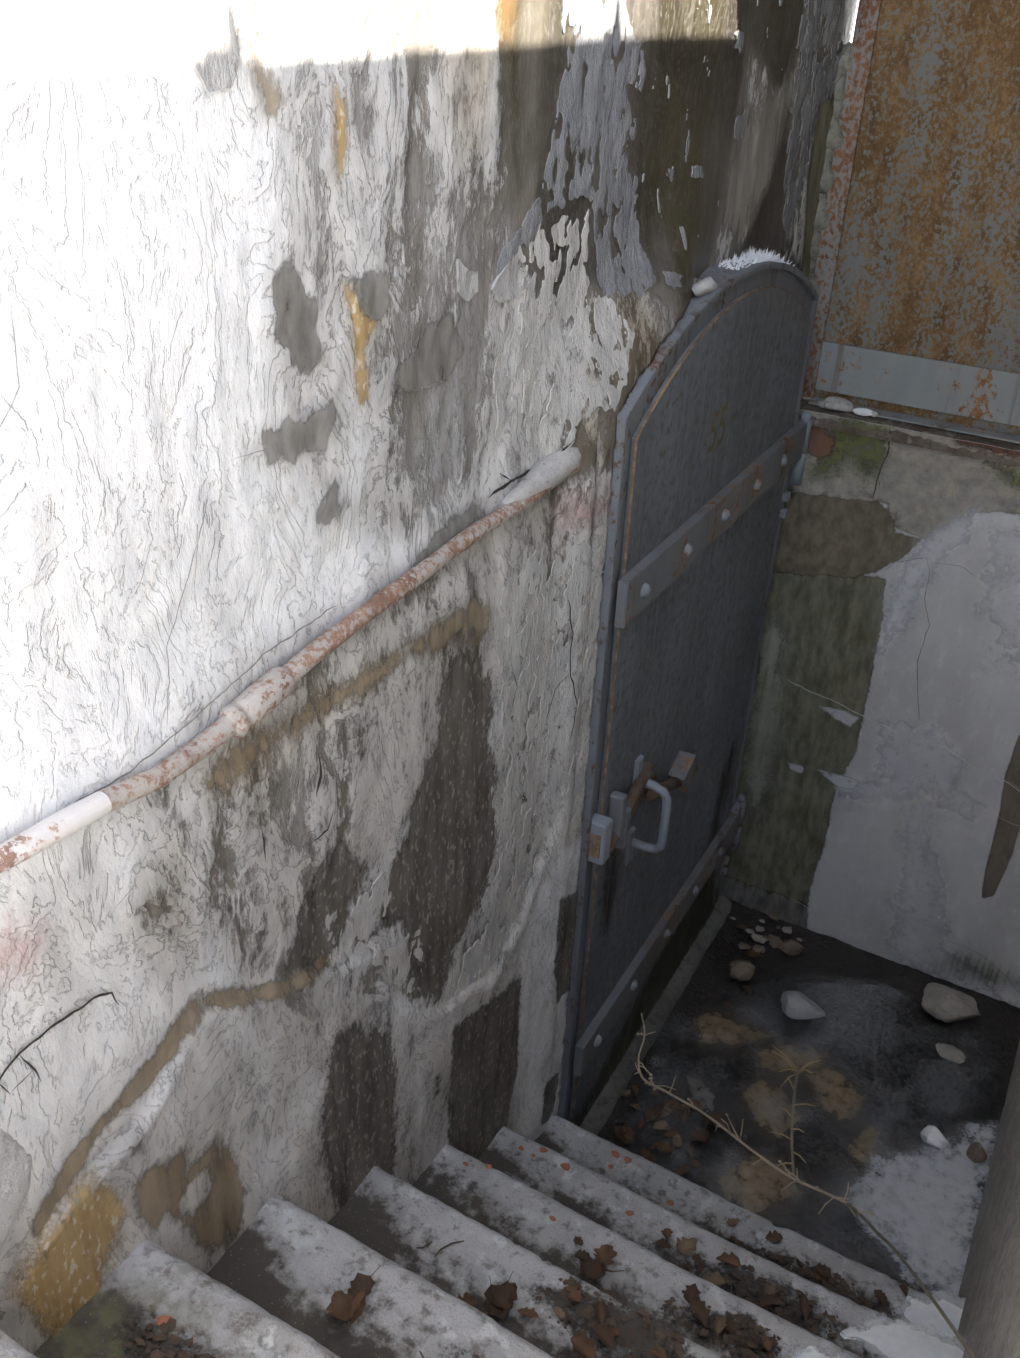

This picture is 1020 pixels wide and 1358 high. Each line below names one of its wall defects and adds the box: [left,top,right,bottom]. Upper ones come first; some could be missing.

peeling [493,0,704,460]
peeling [734,30,744,53]
leakage [724,70,795,258]
peeling [782,0,846,238]
leakage [802,88,836,278]
peeling [724,409,1020,905]
leakage [202,597,499,1007]
spalling [730,911,802,953]
crack [0,992,119,1094]
leakage [321,1021,398,1209]
leakage [447,978,521,1159]